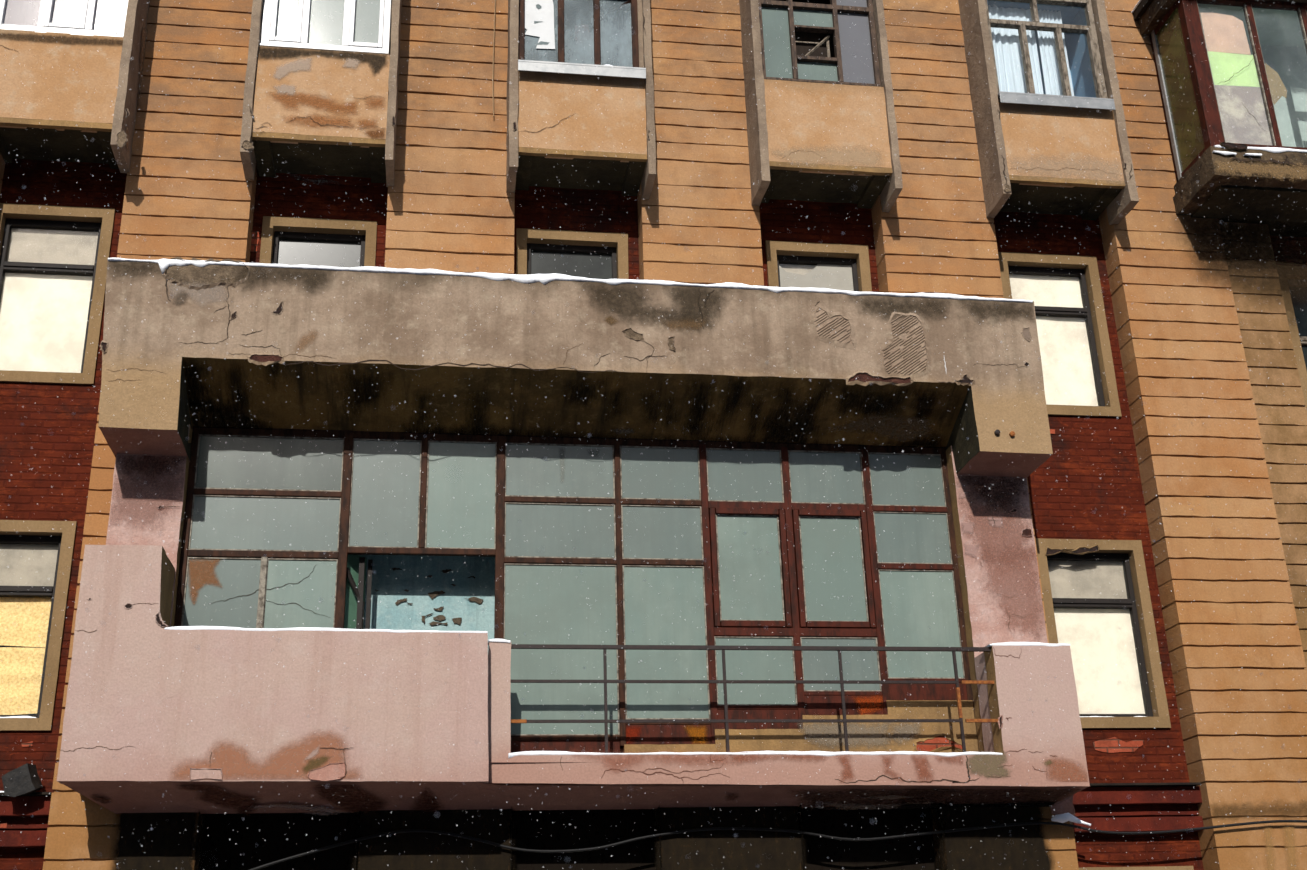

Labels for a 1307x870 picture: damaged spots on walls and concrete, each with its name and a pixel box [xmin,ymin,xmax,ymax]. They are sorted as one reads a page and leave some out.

peeling [274,58,311,95]
crack [179,287,665,373]
peeling [846,311,932,386]
water stain [644,384,825,444]
water stain [826,389,940,448]
water stain [958,475,1023,511]
rust [855,696,883,715]
rust [687,727,706,744]
peeling [190,768,223,781]
peeling [307,763,346,782]